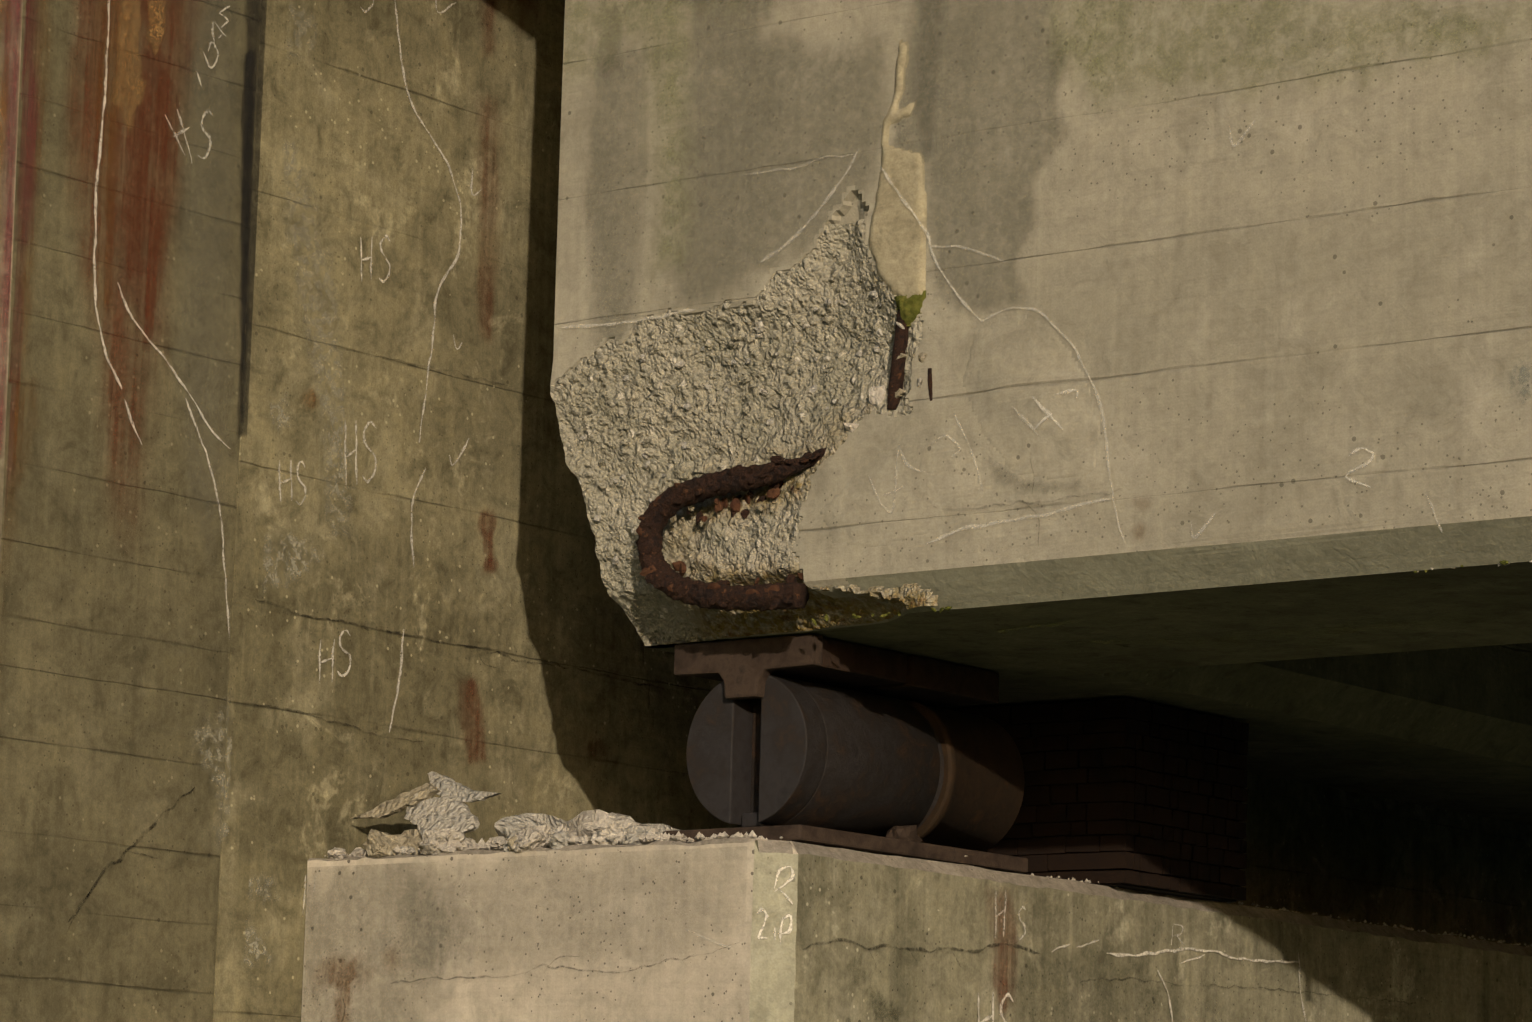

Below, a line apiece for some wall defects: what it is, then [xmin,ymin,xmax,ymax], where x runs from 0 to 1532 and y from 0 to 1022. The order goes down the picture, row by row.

corrosion [0,0,20,328]
corrosion [77,0,168,454]
corrosion [636,448,823,535]
spalling [550,219,952,652]
corrosion [640,557,698,592]
crack [68,787,195,922]
crack [808,939,1038,954]